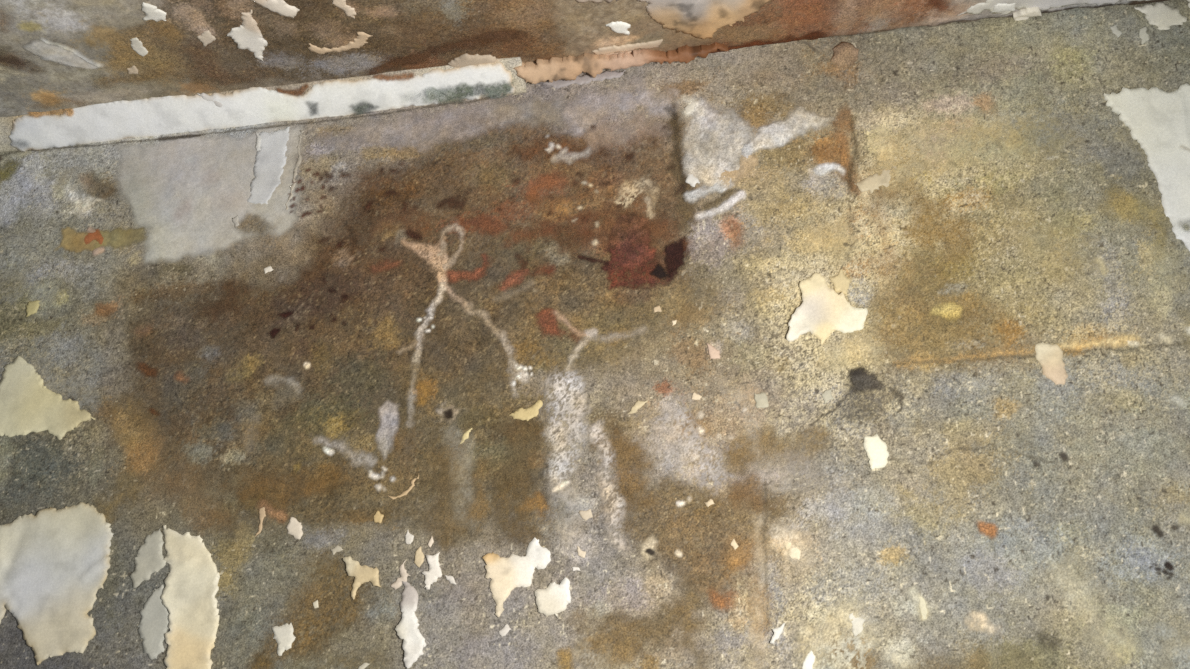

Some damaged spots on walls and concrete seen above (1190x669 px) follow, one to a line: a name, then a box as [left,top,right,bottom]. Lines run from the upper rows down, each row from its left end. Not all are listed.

rust [709,0,957,53]
peeling [957,0,1190,44]
peeling [9,0,772,288]
peeling [1103,83,1190,251]
rust [579,198,687,289]
peeling [786,268,868,345]
peeling [0,356,95,440]
damp [115,84,825,669]
peeling [0,502,113,665]
peeling [130,525,220,669]
peeling [482,537,586,637]
damp [800,603,874,669]